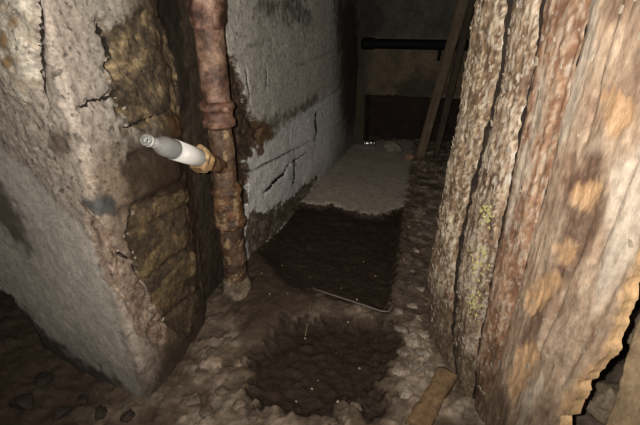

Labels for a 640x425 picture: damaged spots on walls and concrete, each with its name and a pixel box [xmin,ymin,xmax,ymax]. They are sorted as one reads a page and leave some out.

crack [38,0,46,93]
crack [76,23,112,108]
spalling [95,6,180,135]
spalling [226,48,319,255]
crack [253,111,317,194]
spalling [81,188,198,346]